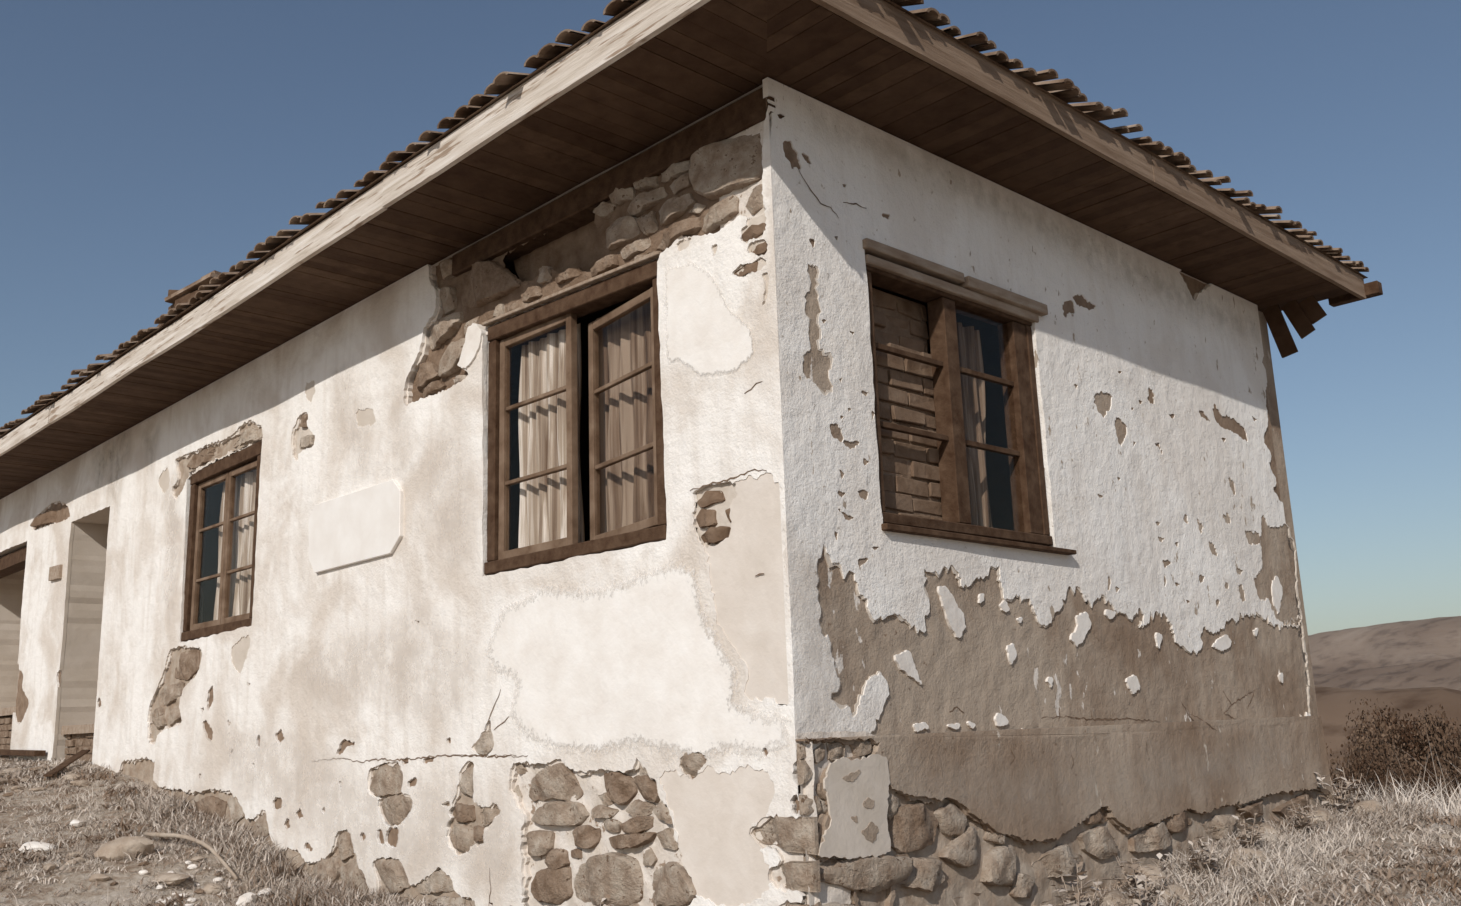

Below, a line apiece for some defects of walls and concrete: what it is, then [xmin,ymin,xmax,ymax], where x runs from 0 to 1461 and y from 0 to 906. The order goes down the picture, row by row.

peeling [783,141,889,219]
spalling [406,84,781,405]
peeling [802,239,842,396]
flaking render [159,420,263,499]
peeling [830,408,869,465]
peeling [1093,388,1154,446]
peeling [1199,390,1280,500]
flaking render [30,501,70,530]
flaking render [16,671,29,723]
peeling [446,469,1328,906]
spalling [120,645,491,906]
crack [312,754,528,763]